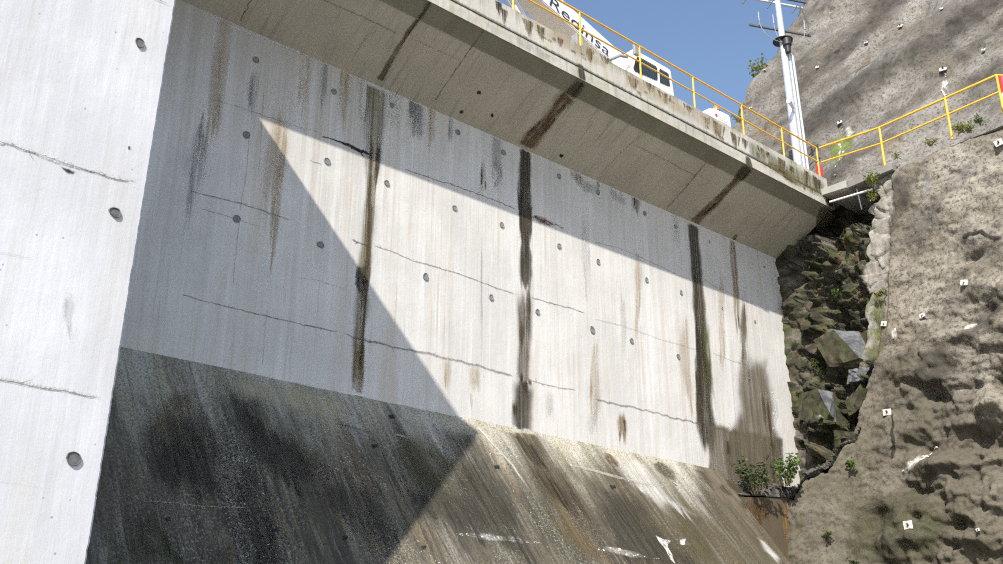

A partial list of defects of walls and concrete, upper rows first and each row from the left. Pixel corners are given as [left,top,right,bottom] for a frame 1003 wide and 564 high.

leakage [628,76,693,111]
leakage [798,0,998,137]
leakage [353,2,431,378]
leakage [703,116,834,227]
leakage [890,178,908,226]
leakage [513,149,587,518]
leakage [674,216,783,516]